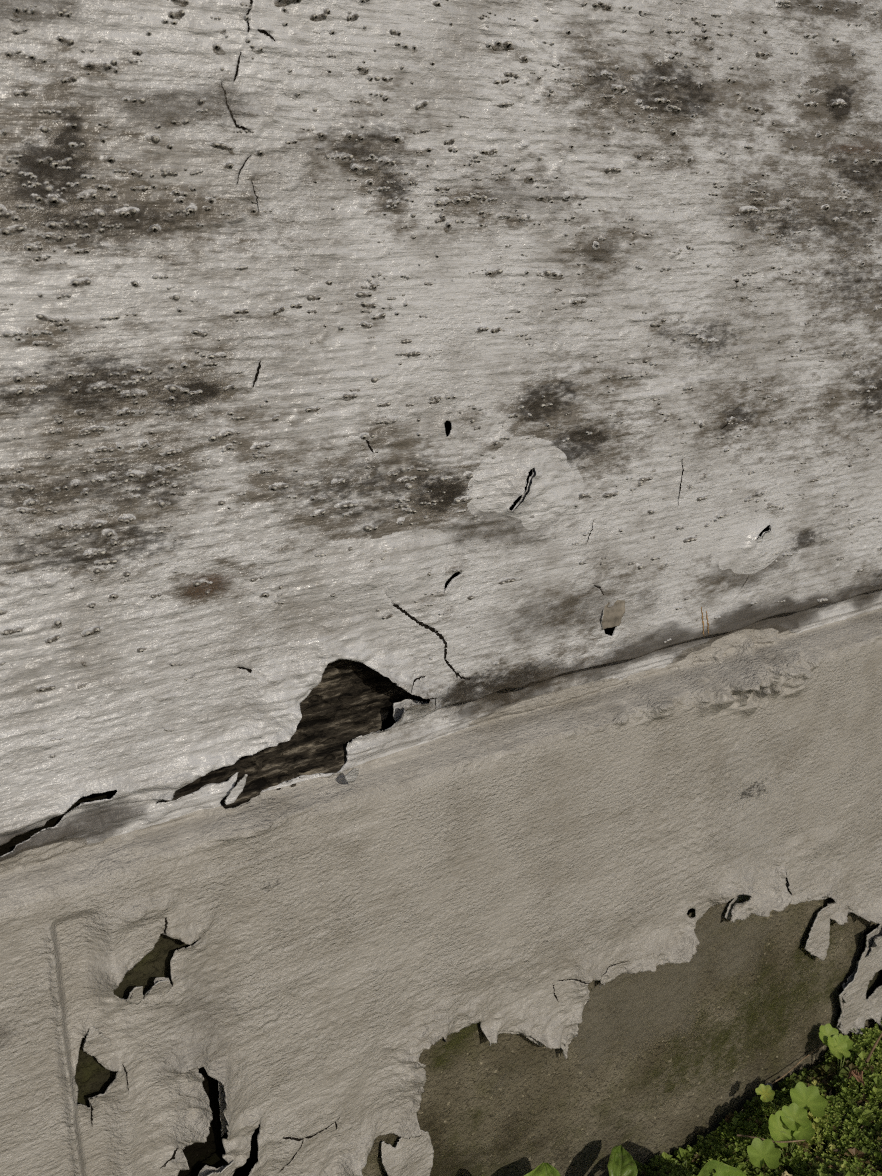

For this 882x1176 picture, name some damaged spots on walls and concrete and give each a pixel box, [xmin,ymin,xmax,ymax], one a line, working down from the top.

crack [221,0,275,211]
damp [633,66,710,115]
damp [827,85,854,120]
damp [16,115,86,204]
damp [843,159,882,191]
damp [420,483,465,511]
crack [391,601,470,704]
peeling [156,659,429,809]
peeling [113,934,189,1005]
peeling [362,861,882,1176]
peeling [75,1026,118,1107]
peeling [178,1067,260,1176]